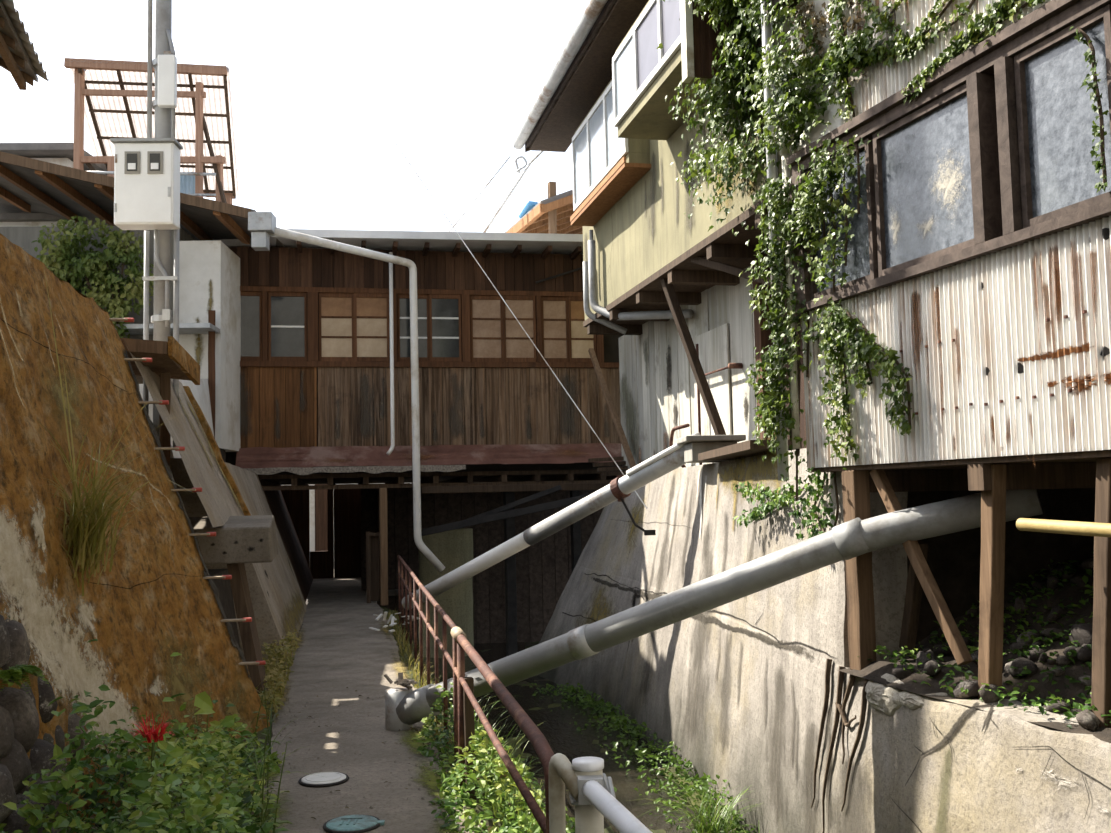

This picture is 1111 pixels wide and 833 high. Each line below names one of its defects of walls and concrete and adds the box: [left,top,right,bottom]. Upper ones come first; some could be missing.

rust [901,288,960,414]
rust [1018,242,1111,397]
crack [586,573,667,600]
leakage [638,631,655,694]
leakage [591,466,737,602]
leakage [684,611,822,750]
crack [708,606,834,658]
leakage [764,659,864,833]